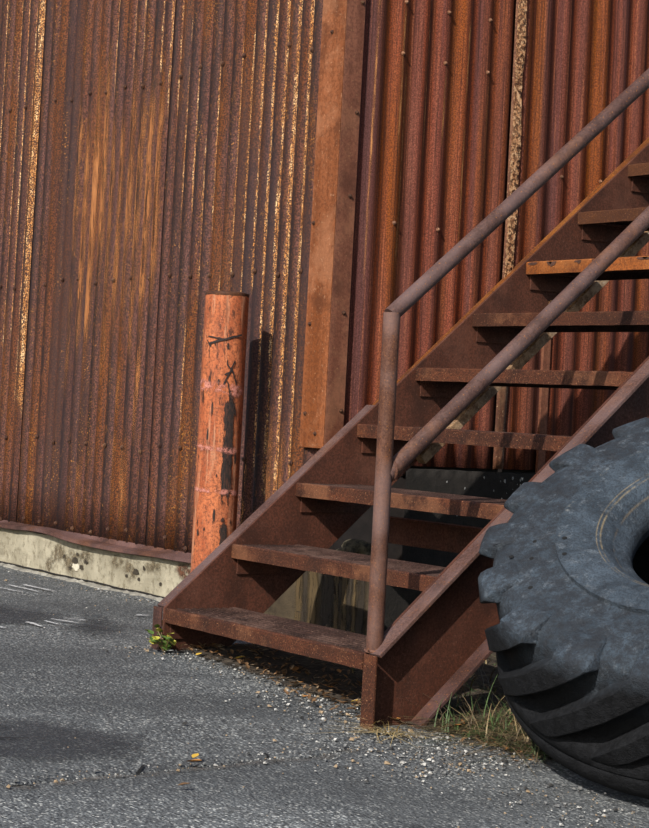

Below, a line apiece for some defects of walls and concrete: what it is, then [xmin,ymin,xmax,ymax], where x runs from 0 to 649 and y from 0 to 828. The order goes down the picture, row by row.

rust [3,0,46,406]
rust [73,0,221,334]
rust [231,0,315,494]
leakage [0,721,134,758]